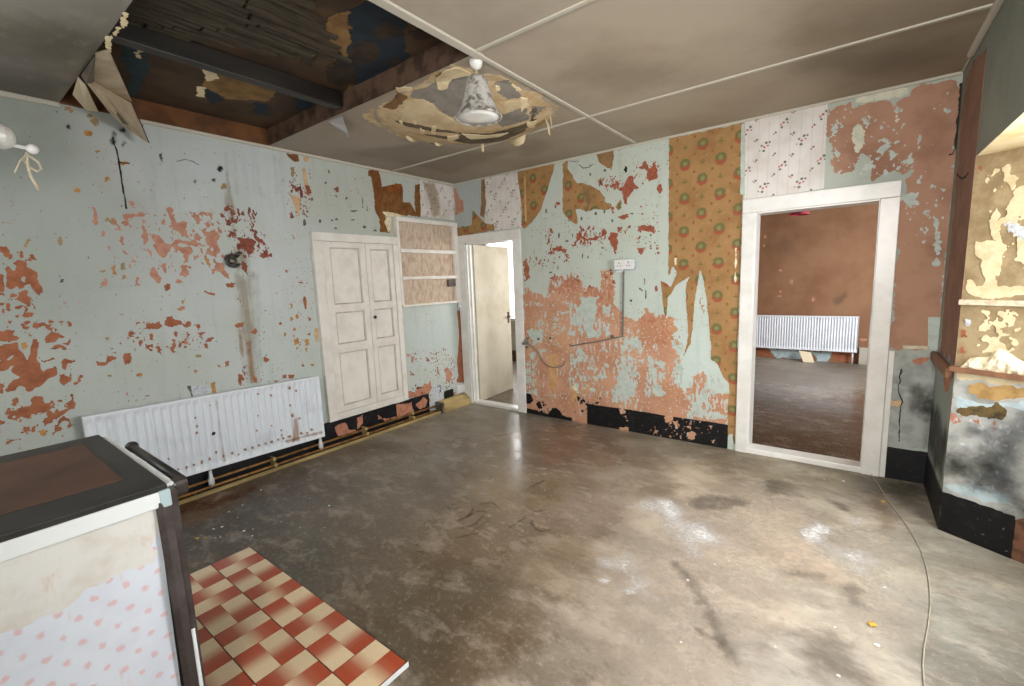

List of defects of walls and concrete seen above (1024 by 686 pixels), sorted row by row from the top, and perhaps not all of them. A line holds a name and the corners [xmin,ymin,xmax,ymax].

peeling [196,69,276,116]
peeling [300,1,433,89]
crack [112,137,130,209]
peeling [286,153,377,232]
peeling [0,238,83,444]
peeling [96,300,214,377]
peeling [91,201,272,307]
peeling [217,282,318,386]
peeling [522,151,729,443]
peeling [826,44,1024,564]
crack [896,369,904,442]
leakage [887,348,1017,501]